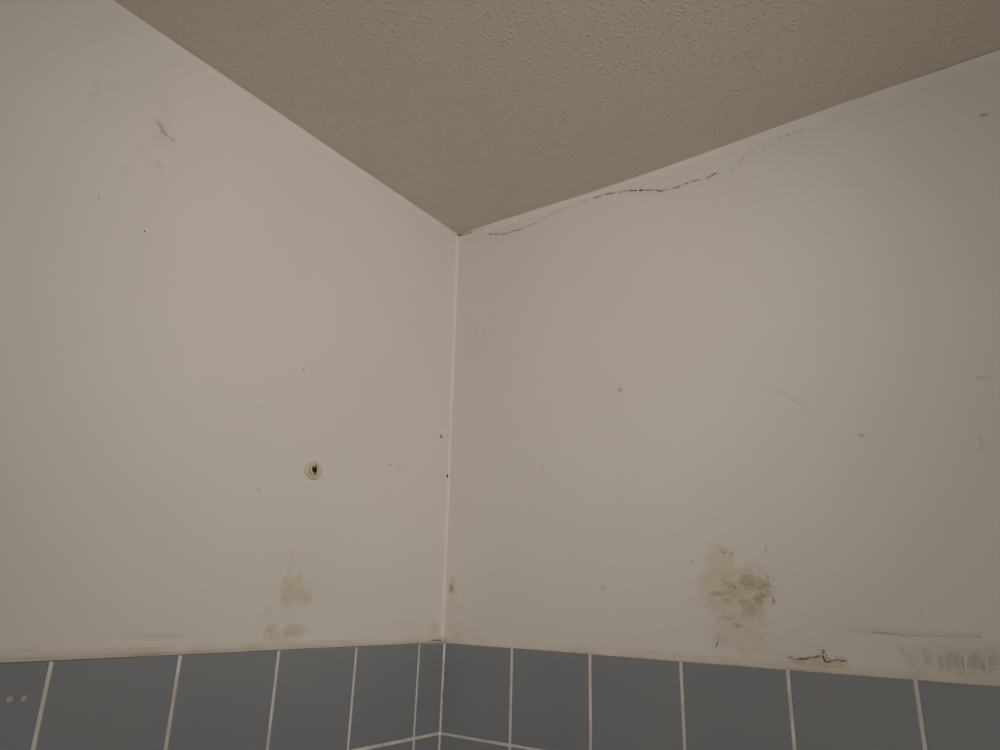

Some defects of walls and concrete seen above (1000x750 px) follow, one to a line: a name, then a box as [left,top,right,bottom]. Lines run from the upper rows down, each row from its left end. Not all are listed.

crack [458,172,718,235]